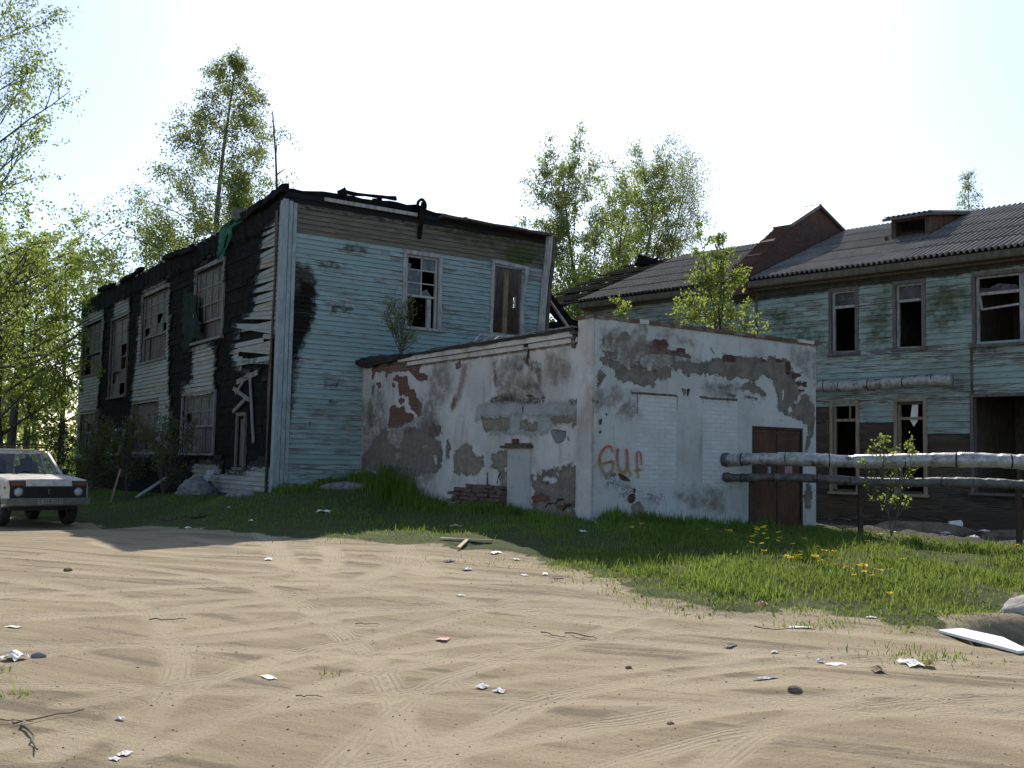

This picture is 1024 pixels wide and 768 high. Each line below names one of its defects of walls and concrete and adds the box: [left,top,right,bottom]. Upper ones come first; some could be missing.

peeling [596,331,815,452]
peeling [361,359,508,486]
peeling [481,413,537,437]
flaking render [551,414,577,443]
peeling [530,463,576,517]